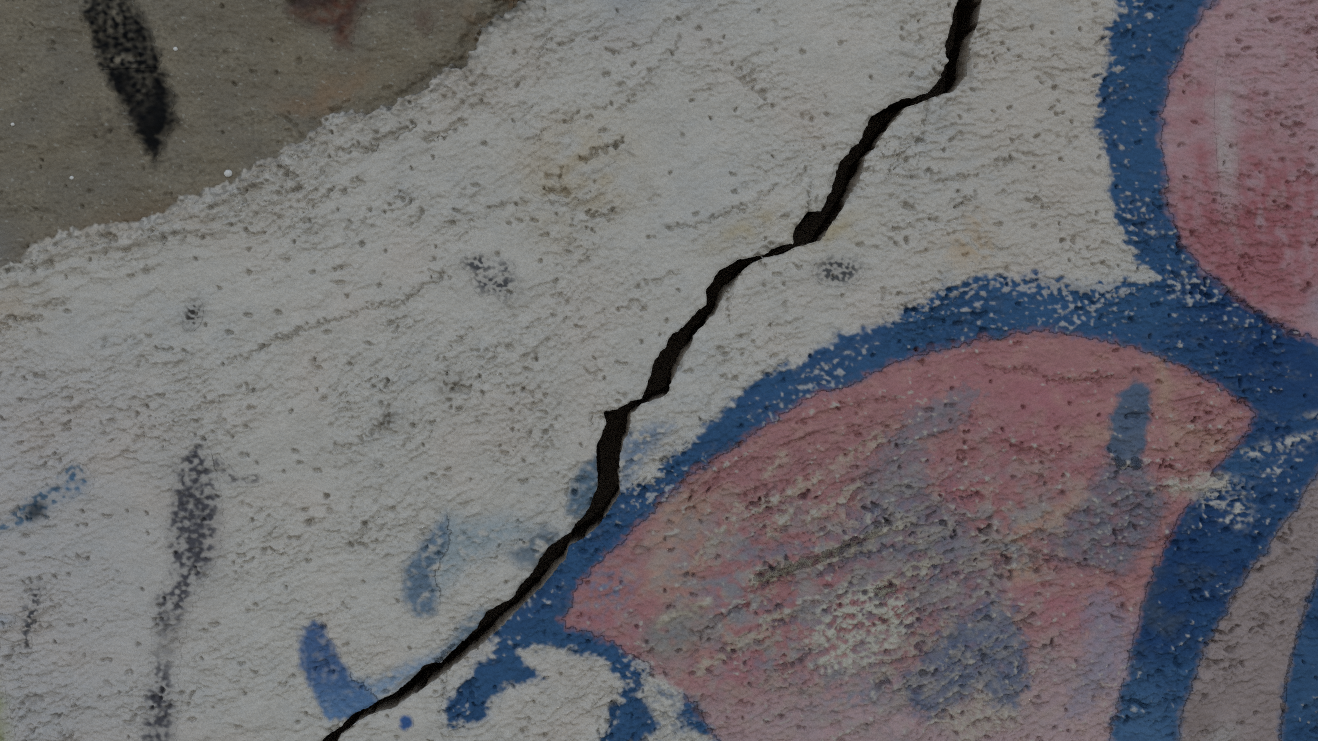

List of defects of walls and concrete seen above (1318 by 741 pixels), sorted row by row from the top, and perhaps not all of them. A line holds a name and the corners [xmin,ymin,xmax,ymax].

spalling [0,0,545,280]
crack [274,98,353,140]
crack [322,0,986,741]